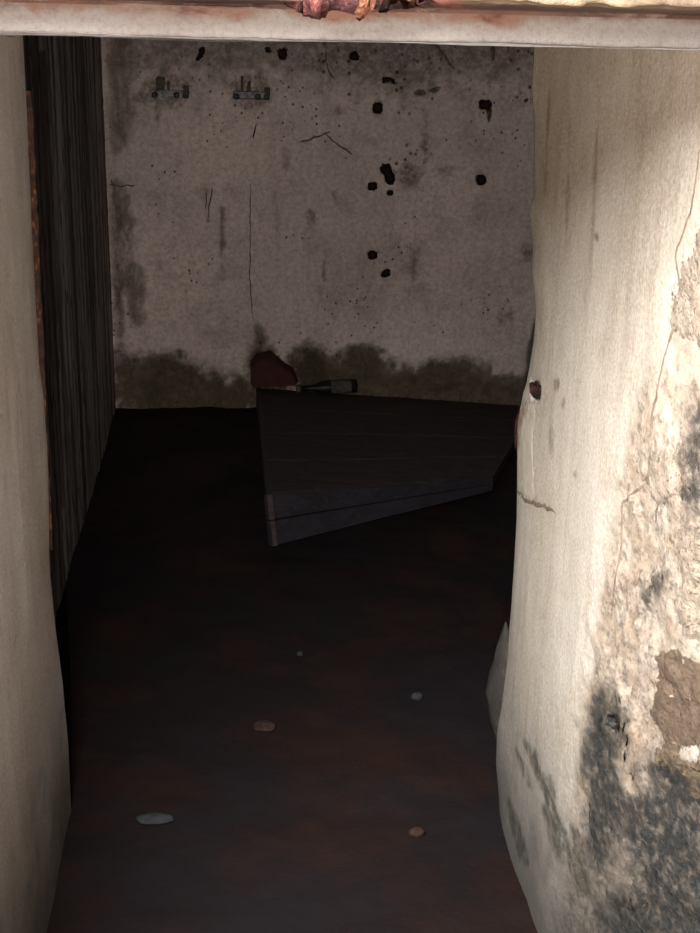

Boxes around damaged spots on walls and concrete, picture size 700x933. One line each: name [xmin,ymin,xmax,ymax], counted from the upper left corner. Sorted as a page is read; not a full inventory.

spalling [670,230,700,347]
water stain [114,328,286,409]
water stain [287,344,527,406]
spalling [646,437,700,506]
spalling [673,524,700,639]
spalling [650,649,700,806]
water stain [520,691,700,933]